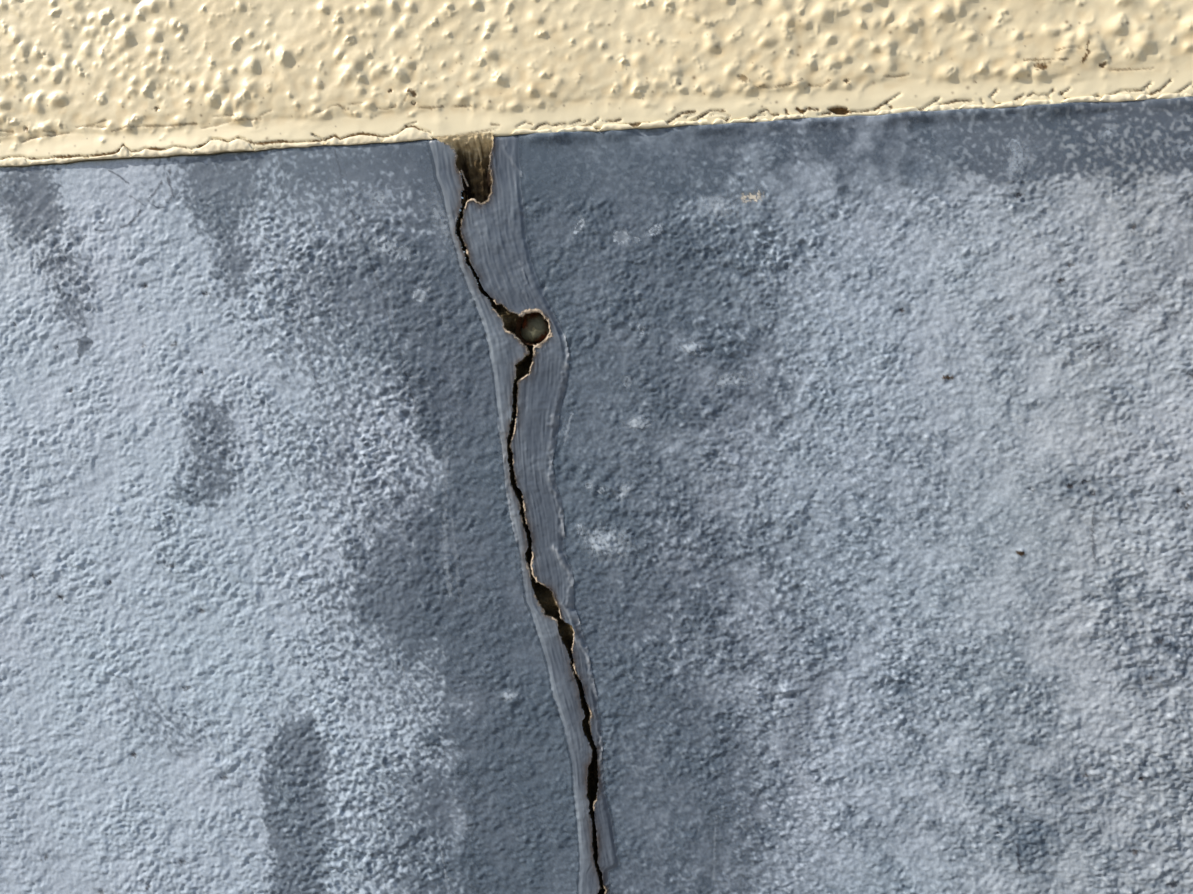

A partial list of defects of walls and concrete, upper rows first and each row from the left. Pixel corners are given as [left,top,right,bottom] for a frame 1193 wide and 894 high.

water stain [0,168,84,314]
spalling [432,132,494,208]
water stain [171,404,234,506]
crack [455,175,607,894]
water stain [186,97,1193,894]